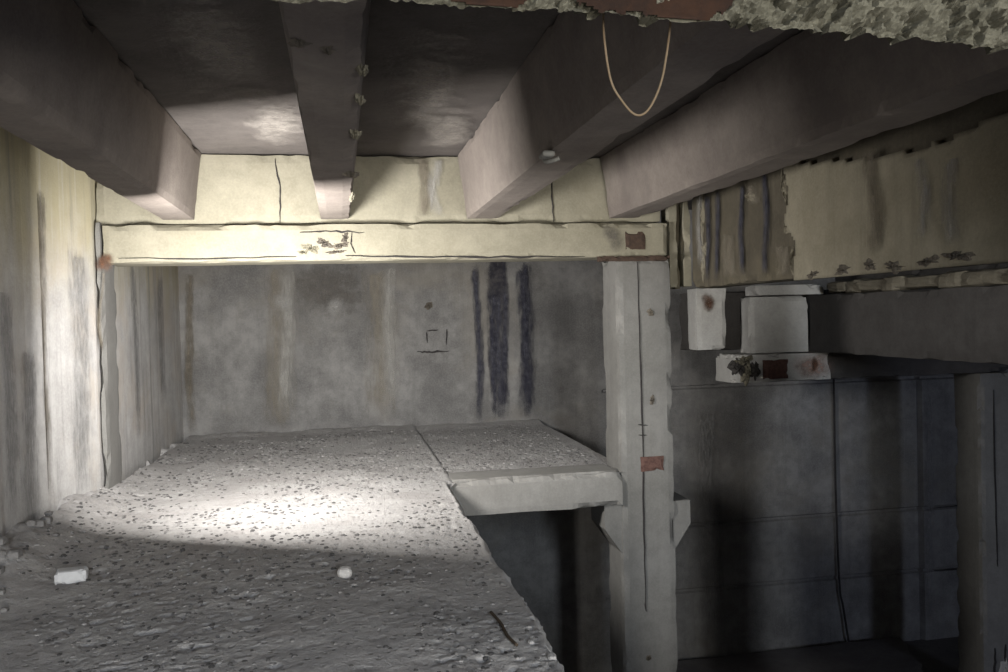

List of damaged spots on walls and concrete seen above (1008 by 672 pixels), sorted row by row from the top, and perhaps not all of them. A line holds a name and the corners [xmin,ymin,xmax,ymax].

rust [576,0,733,21]
damp [2,197,50,496]
damp [472,262,533,411]